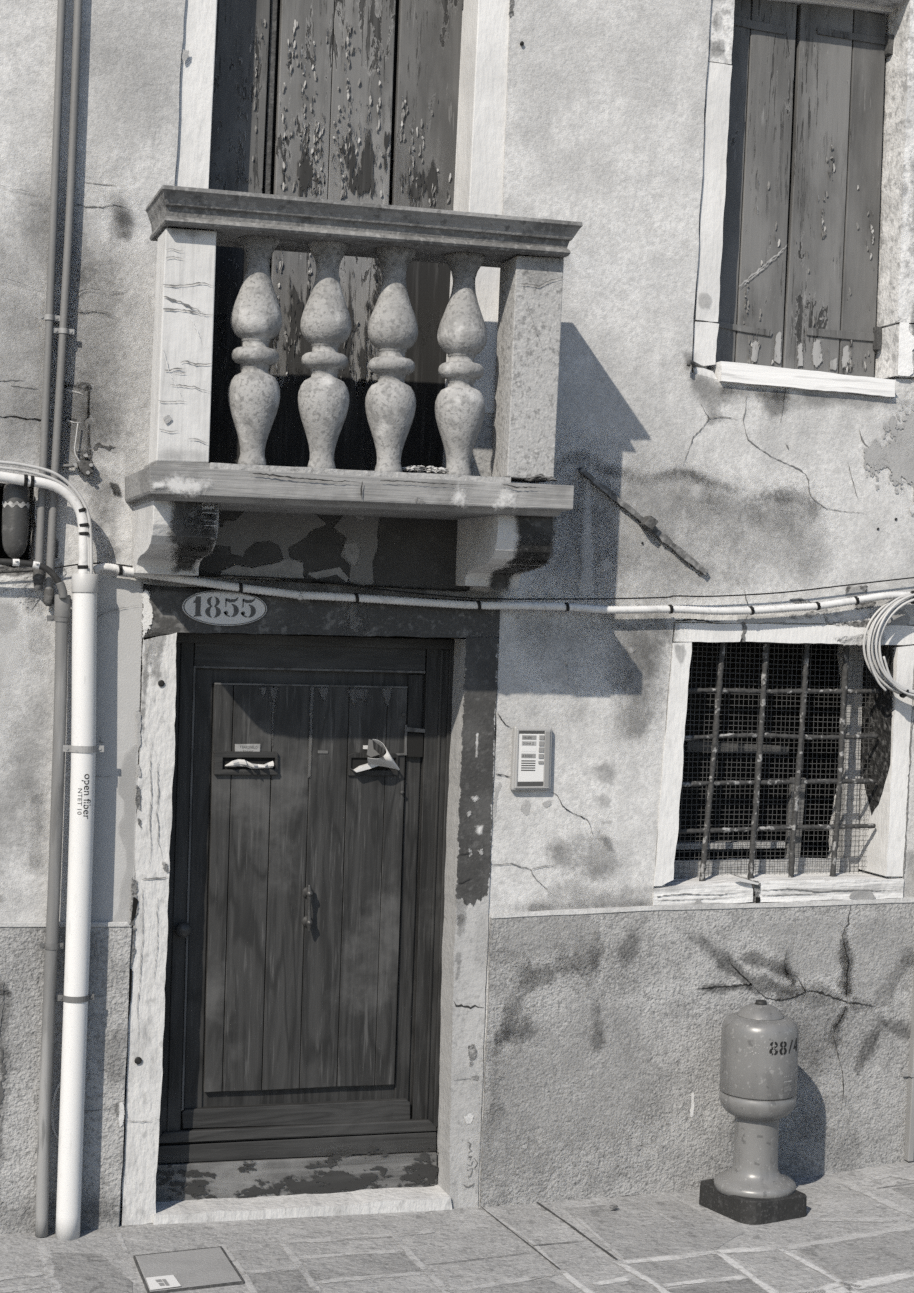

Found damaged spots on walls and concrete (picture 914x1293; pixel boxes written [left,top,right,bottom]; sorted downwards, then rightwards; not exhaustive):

peeling [898,322,914,376]
crack [683,387,869,513]
peeling [863,405,914,516]
peeling [202,502,379,586]
crack [657,688,914,1108]
damp [491,1026,632,1152]